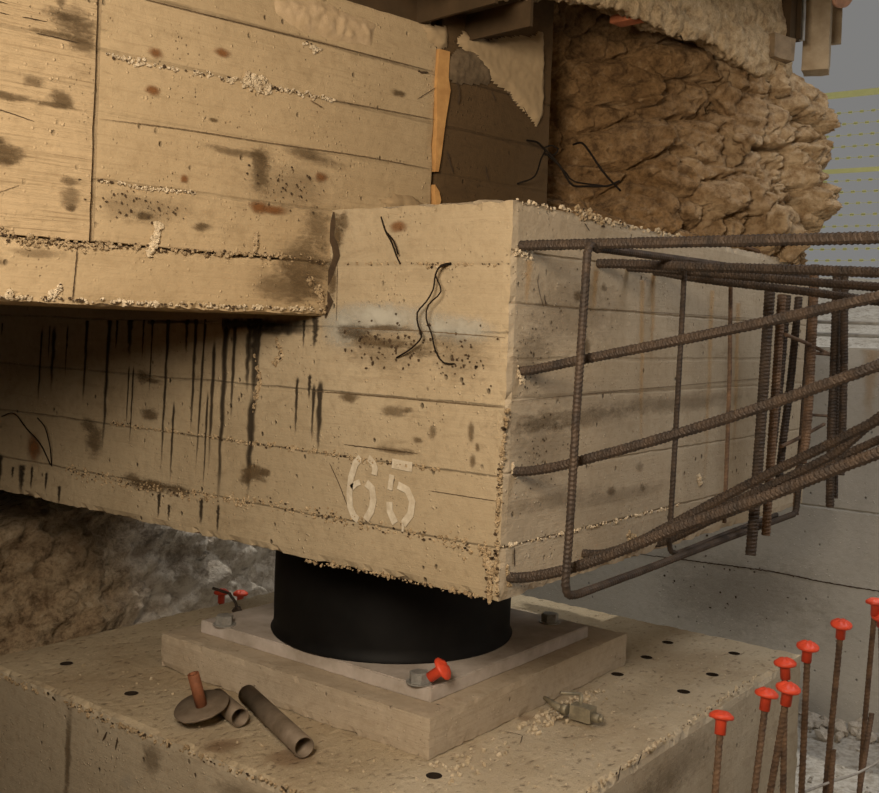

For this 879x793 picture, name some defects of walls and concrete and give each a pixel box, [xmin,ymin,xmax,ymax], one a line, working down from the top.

water stain [35,12,92,51]
water stain [0,141,22,164]
water stain [88,305,484,483]
spalling [304,198,879,605]
water stain [0,455,33,489]
water stain [127,475,187,517]
spalling [0,673,305,793]
spalling [586,640,820,793]